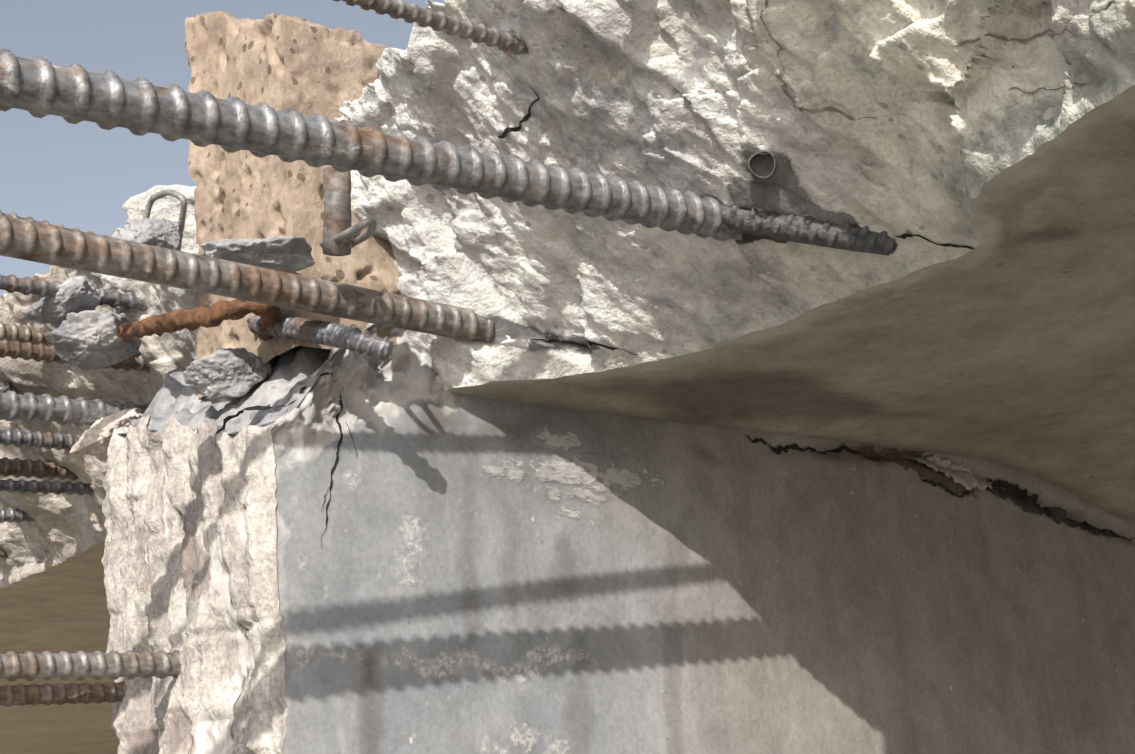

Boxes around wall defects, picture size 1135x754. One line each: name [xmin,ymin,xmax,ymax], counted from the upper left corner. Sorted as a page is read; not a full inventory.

crack [957,0,1124,46]
crack [760,0,874,121]
crack [497,87,540,138]
crack [895,234,975,250]
spalling [0,0,1135,592]
crack [529,339,639,355]
crack [215,372,357,548]
water stain [400,517,422,585]
spalling [129,506,255,754]
spalling [0,650,181,707]
water stain [395,646,597,682]
water stain [482,724,539,754]